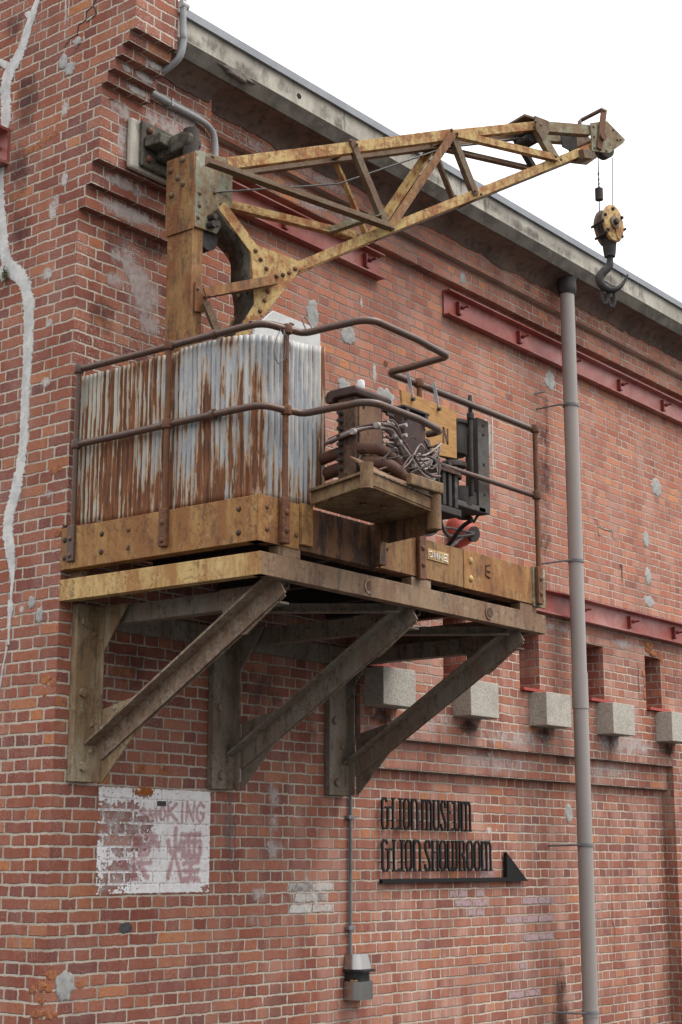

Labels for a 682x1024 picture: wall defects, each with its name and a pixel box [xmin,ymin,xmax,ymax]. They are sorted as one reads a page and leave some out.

crack [0,0,40,128]
crack [0,167,35,688]